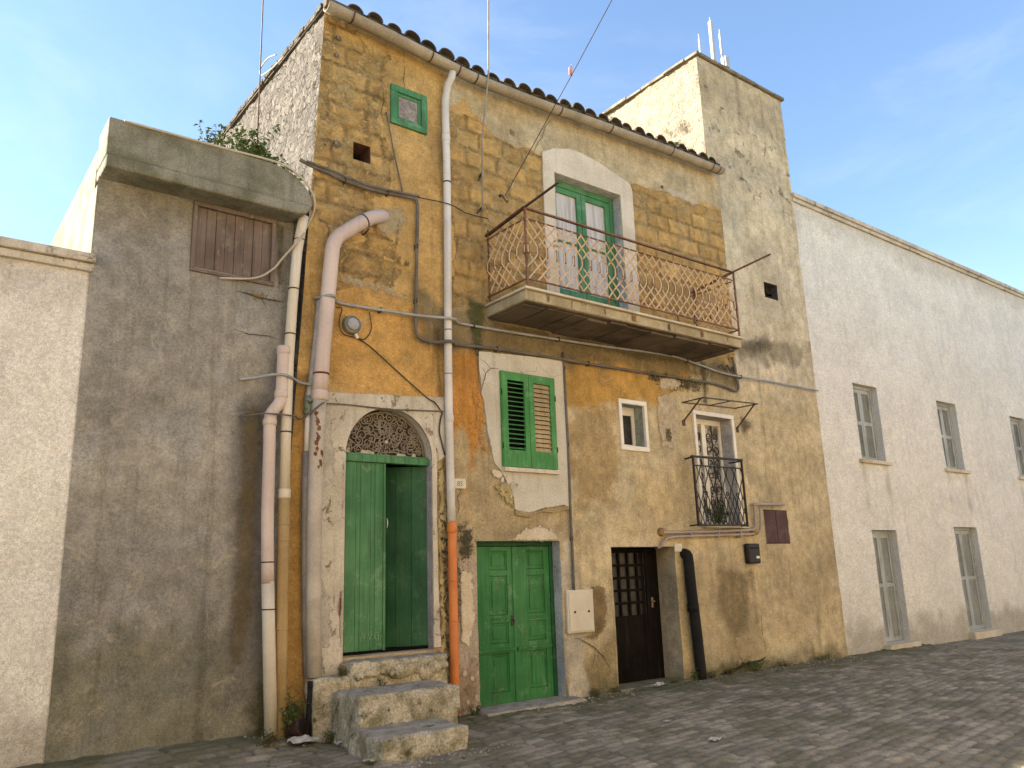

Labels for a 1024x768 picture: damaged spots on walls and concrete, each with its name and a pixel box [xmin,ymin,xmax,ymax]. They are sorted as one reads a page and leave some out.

corrosion [313,411,323,469]
peeling [478,351,569,542]
leakage [457,521,478,619]